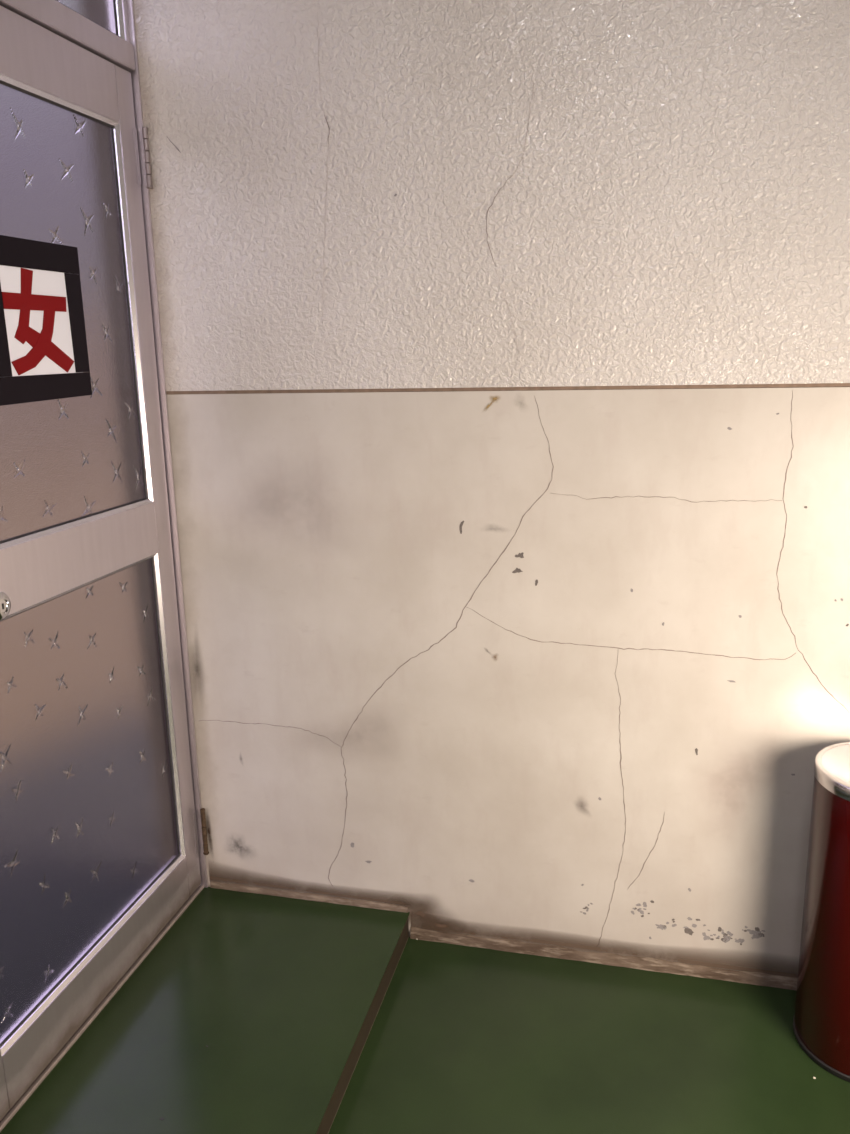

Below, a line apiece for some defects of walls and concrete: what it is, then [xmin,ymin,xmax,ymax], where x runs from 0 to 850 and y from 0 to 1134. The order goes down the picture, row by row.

crack [200,391,848,943]
leakage [209,869,798,978]
peeling [631,900,765,945]